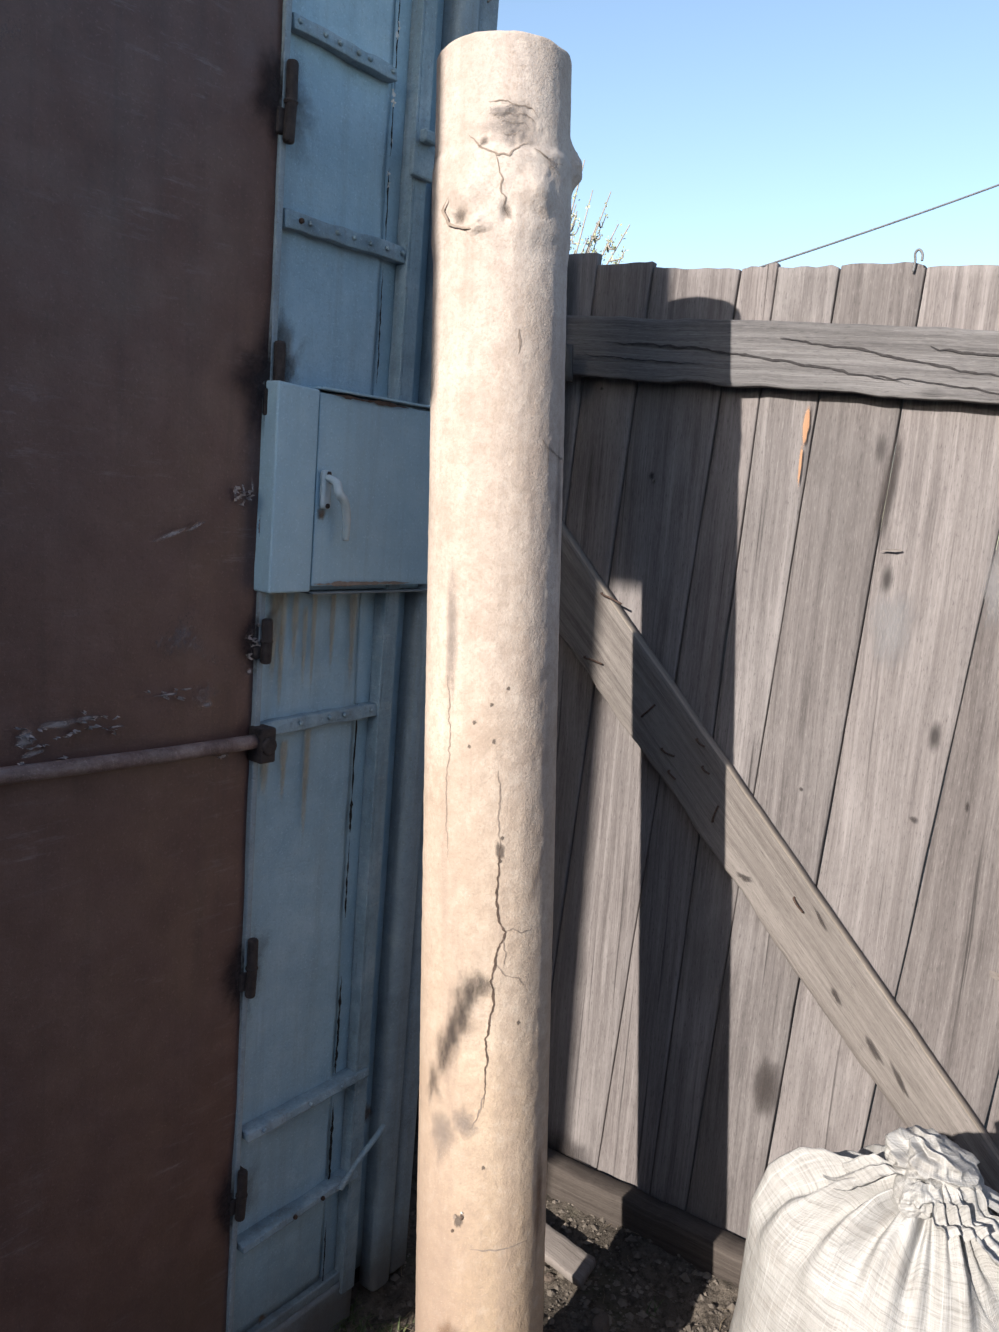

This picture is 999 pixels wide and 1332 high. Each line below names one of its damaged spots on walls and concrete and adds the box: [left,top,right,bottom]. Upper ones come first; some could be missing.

peeling [13,710,122,765]
crack [471,771,531,1128]